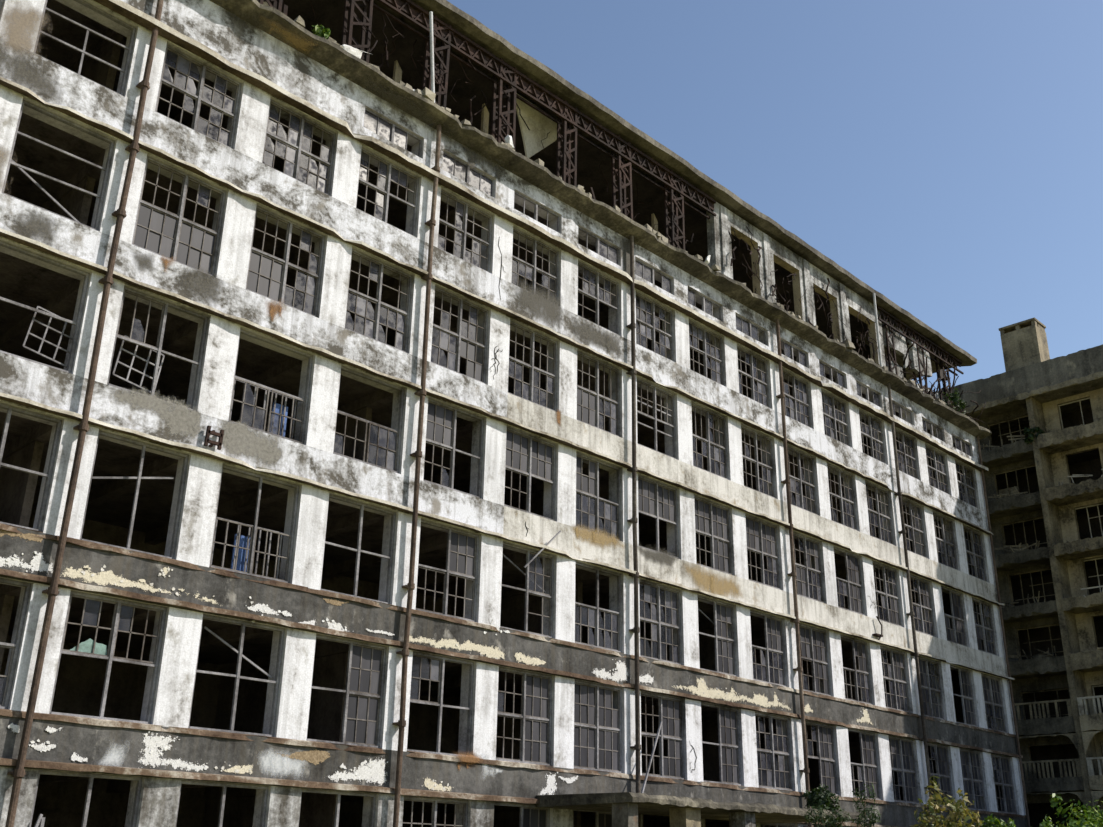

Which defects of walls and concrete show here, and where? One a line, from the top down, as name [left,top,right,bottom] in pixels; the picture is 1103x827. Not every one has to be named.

peeling [0,529,221,606]
peeling [409,619,546,666]
peeling [672,677,791,710]
peeling [138,731,253,774]
spalling [277,749,330,765]
peeling [328,758,389,785]